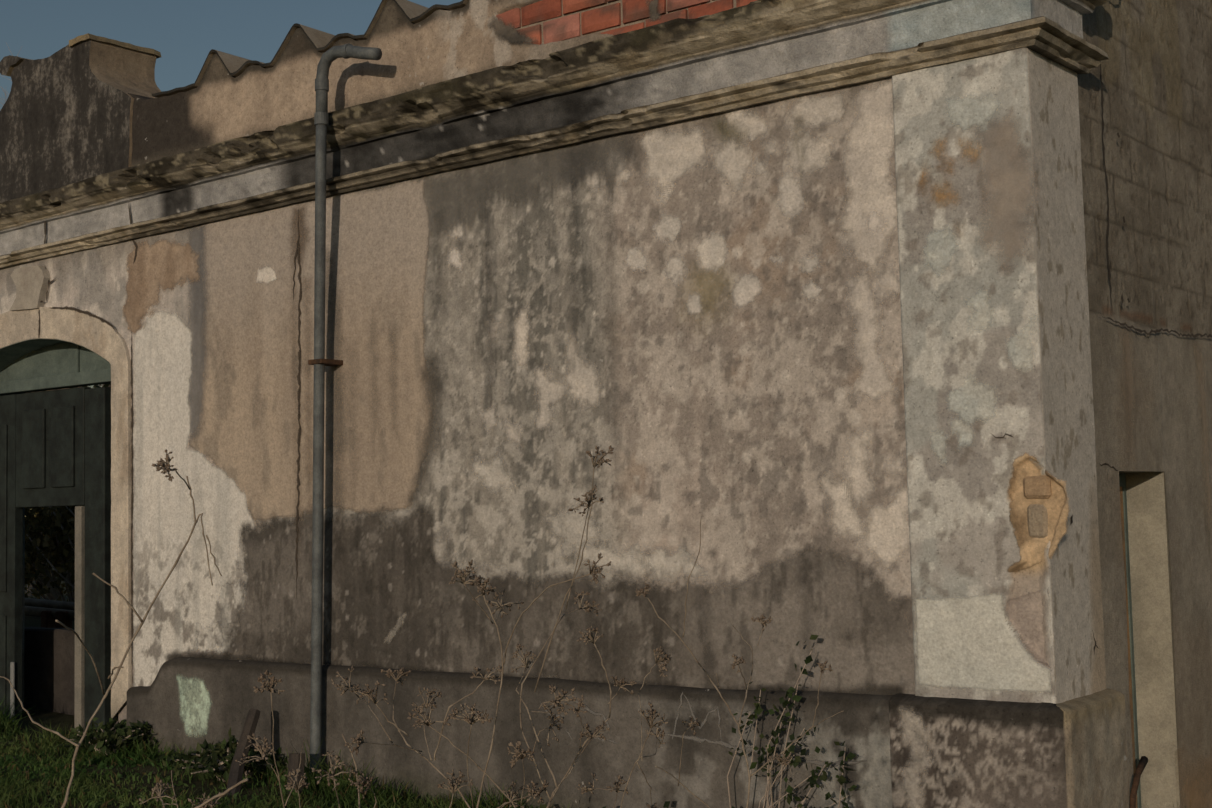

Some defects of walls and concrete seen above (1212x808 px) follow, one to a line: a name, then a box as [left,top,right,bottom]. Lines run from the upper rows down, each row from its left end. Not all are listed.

crack [1098,61,1212,339]
peeling [123,240,254,687]
damp [327,258,342,461]
damp [166,359,915,743]
flaking render [1007,453,1069,572]
peeling [177,677,211,734]